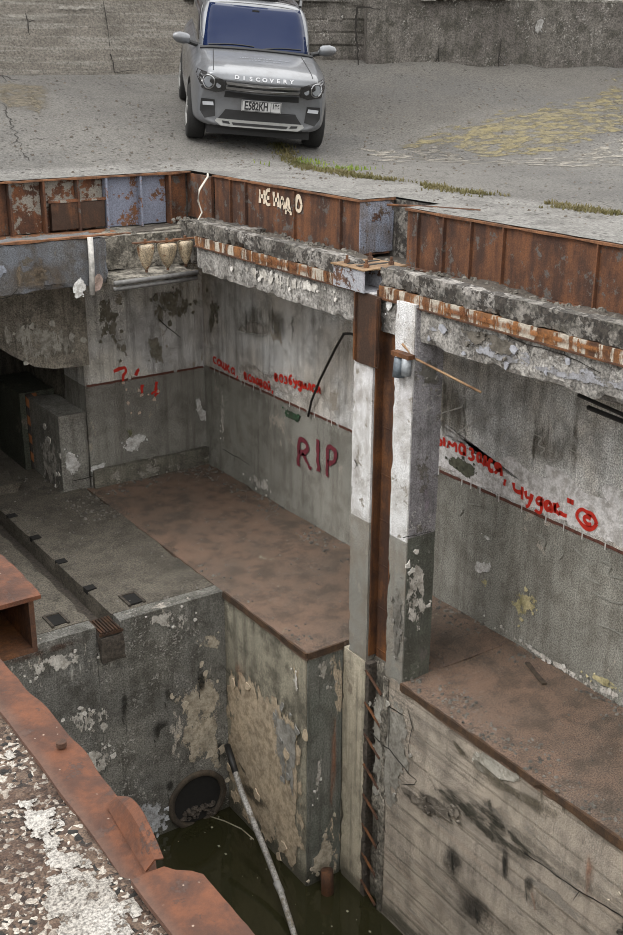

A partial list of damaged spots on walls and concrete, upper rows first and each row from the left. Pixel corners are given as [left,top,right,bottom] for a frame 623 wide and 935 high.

corrosion [417,300,615,355]
peeling [417,360,440,392]
peeling [461,327,623,390]
peeling [390,549,432,659]
peeling [197,631,220,649]
peeling [318,657,337,690]
peeling [170,661,322,867]
damp [479,763,548,812]
peeling [139,802,170,838]
peeling [306,812,336,883]
damp [433,785,538,873]